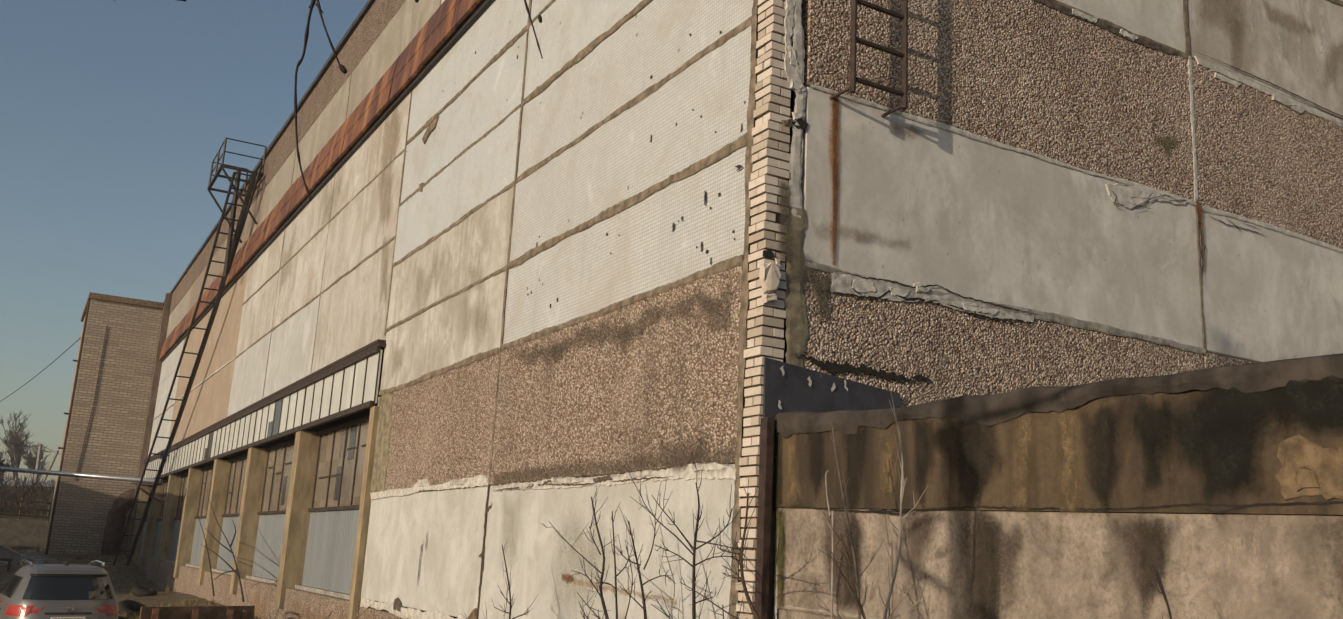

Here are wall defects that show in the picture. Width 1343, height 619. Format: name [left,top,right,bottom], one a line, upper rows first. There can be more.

rust [829,93,839,265]
peeling [1105,183,1191,209]
crack [1110,189,1268,286]
peeling [830,273,1034,323]
peeling [370,462,736,500]
leakage [1059,409,1119,509]
leakage [1141,375,1343,495]
spalling [1275,435,1343,501]
leakage [1123,520,1170,616]